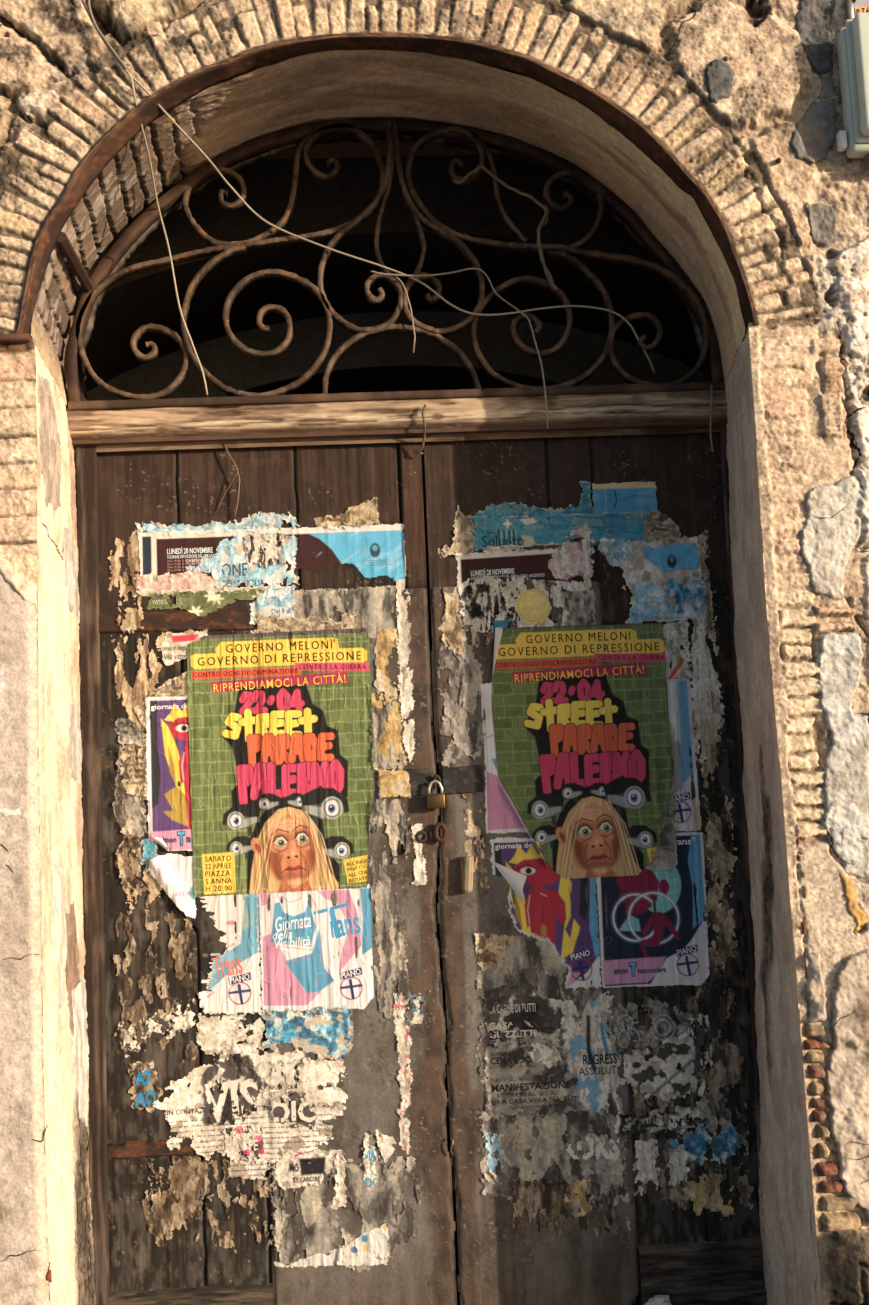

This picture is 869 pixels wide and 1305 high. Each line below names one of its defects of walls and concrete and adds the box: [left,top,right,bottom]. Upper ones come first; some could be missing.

peeling [0,555,38,611]
flaking render [796,837,810,899]
spalling [839,871,867,933]
peeling [802,949,869,1232]